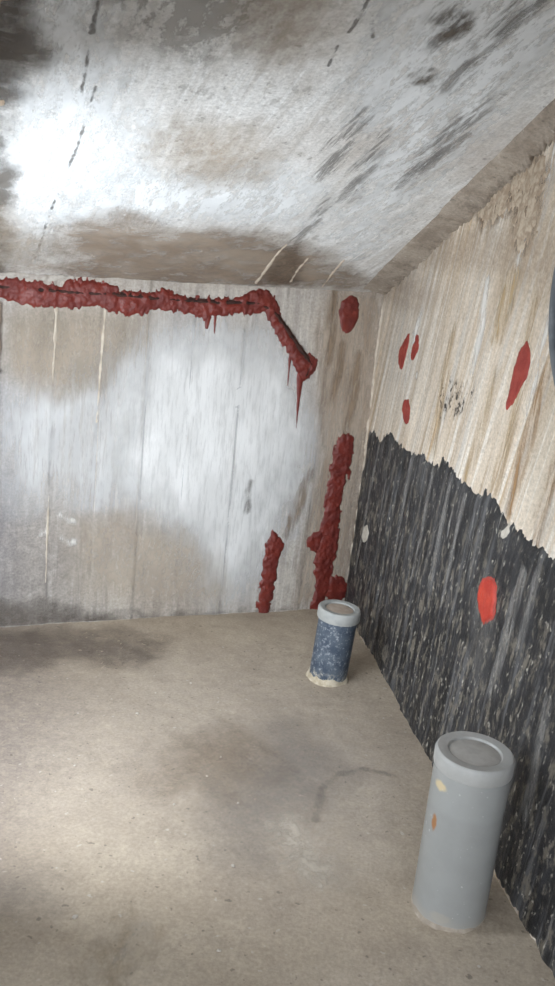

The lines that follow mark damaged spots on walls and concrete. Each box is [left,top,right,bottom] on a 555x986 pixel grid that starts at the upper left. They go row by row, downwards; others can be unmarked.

crack [81,1,99,101]
crack [69,127,84,165]
damp [0,0,555,613]
damp [495,569,540,674]
damp [524,698,550,822]